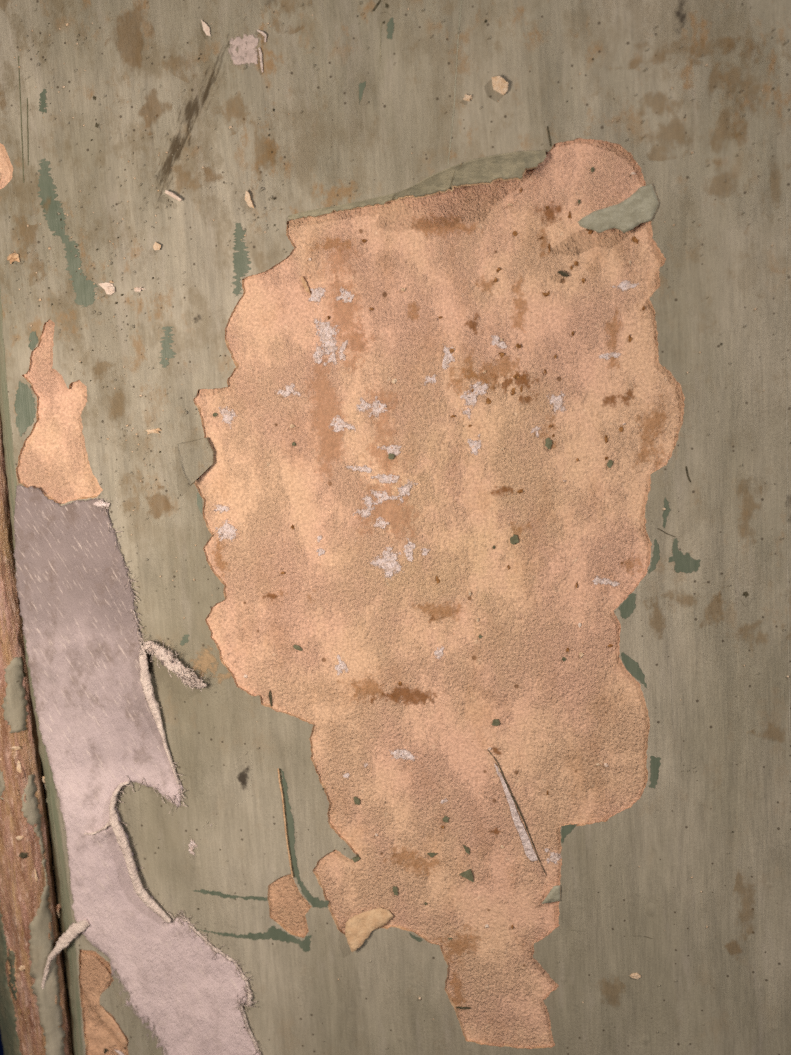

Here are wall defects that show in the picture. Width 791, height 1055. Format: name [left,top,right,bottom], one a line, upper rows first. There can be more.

peeling [17,320,103,504]
peeling [178,138,685,1049]
peeling [79,949,129,1055]